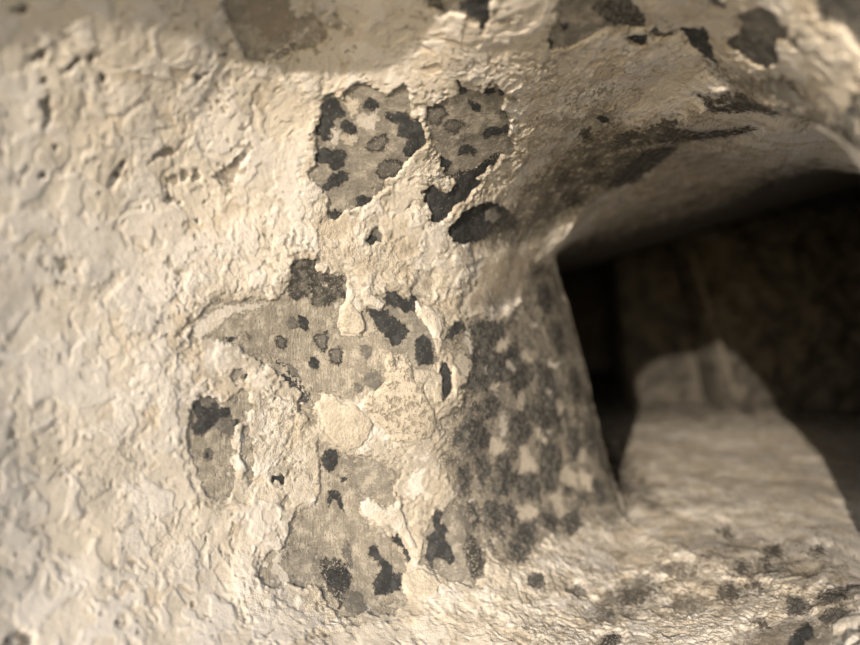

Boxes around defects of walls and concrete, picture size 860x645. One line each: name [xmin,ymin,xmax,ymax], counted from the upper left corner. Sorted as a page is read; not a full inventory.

peeling [224,0,328,61]
peeling [186,258,633,617]
water stain [715,523,737,540]
water stain [597,634,621,645]
water stain [588,562,697,619]
water stain [673,543,790,612]
water stain [786,587,860,637]